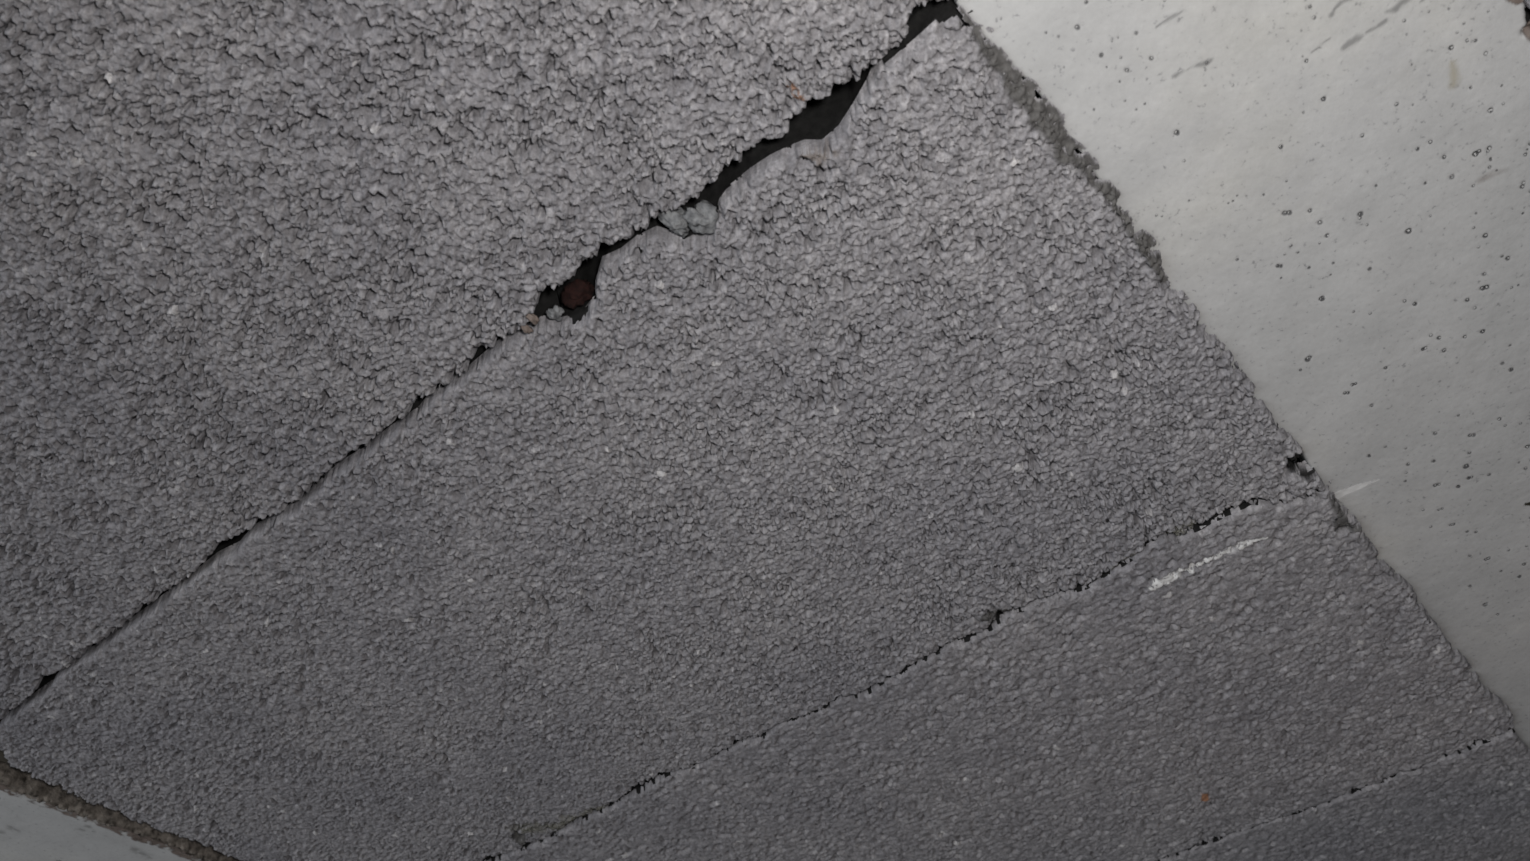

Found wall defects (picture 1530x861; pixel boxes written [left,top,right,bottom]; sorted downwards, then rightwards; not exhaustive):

crack [91,0,973,647]
crack [9,671,59,711]